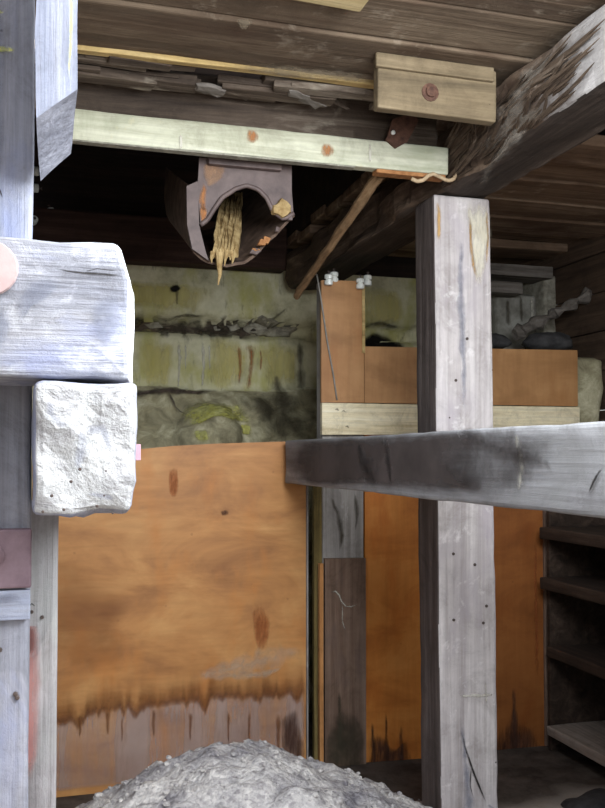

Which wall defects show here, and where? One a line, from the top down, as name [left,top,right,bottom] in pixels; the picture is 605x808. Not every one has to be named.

rust [200,166,222,220]
rust [249,198,293,255]
water stain [133,285,188,307]
spalling [213,315,299,337]
water stain [256,347,303,432]
water stain [57,686,303,787]
water stain [371,719,407,762]